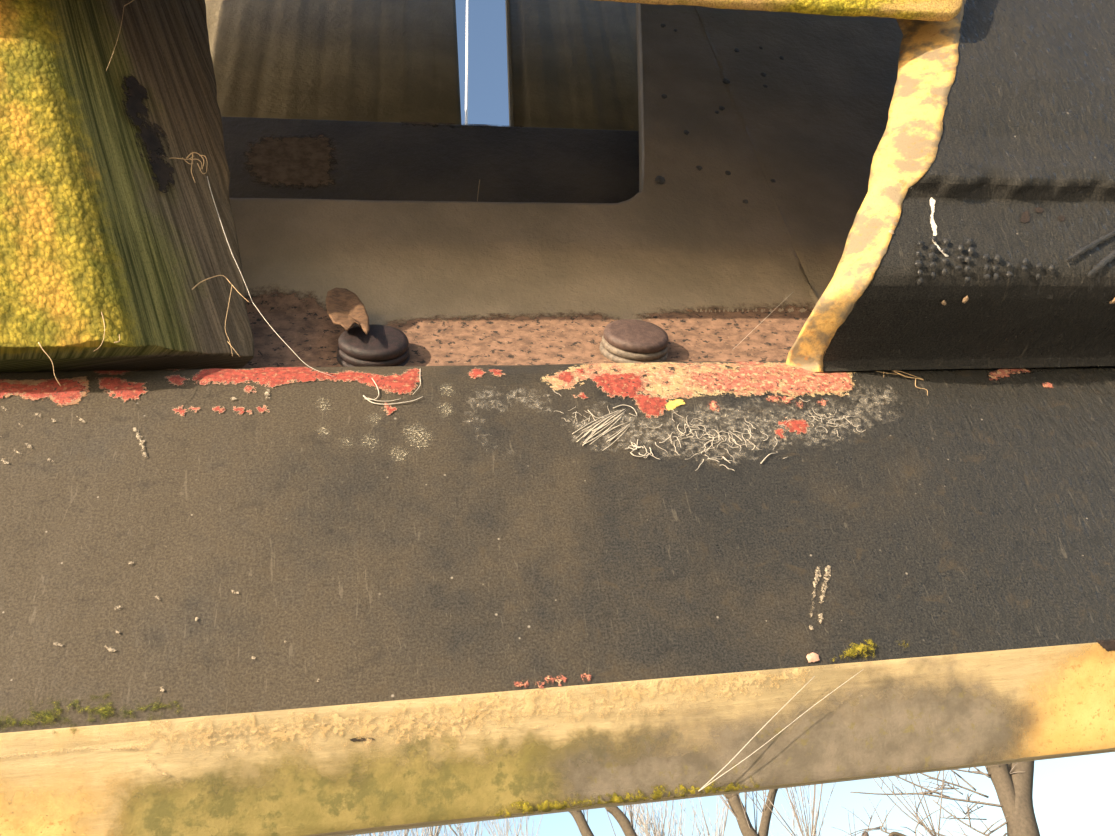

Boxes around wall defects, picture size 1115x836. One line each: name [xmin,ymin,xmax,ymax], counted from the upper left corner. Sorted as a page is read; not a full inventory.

peeling [166,367,423,416]
peeling [542,361,856,438]
leakage [117,667,1027,836]